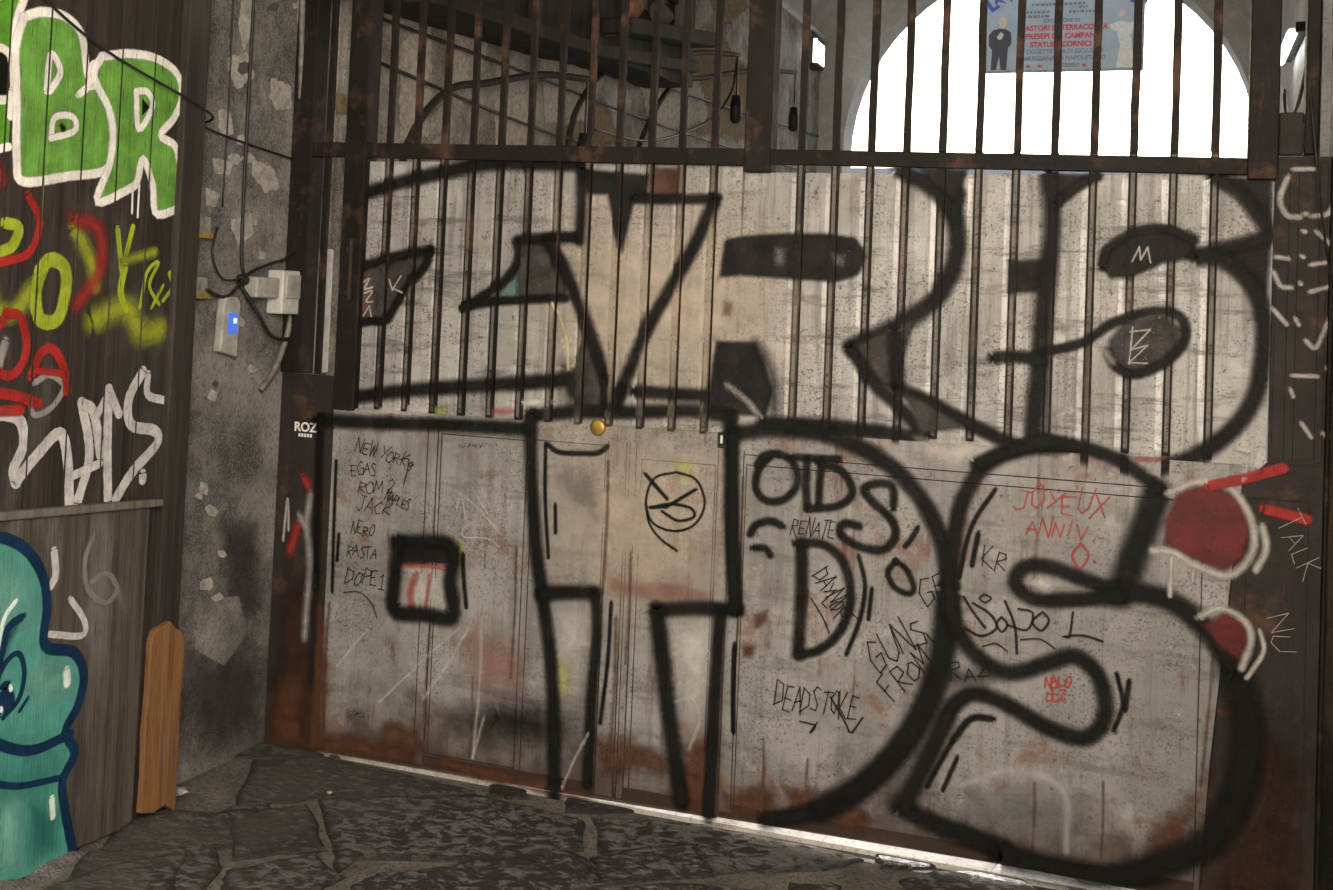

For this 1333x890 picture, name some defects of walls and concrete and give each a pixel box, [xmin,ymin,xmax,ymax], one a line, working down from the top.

corrosion [273,584,430,762]
corrosion [438,709,587,799]
corrosion [595,462,665,772]
corrosion [684,738,813,819]
corrosion [1200,655,1214,786]